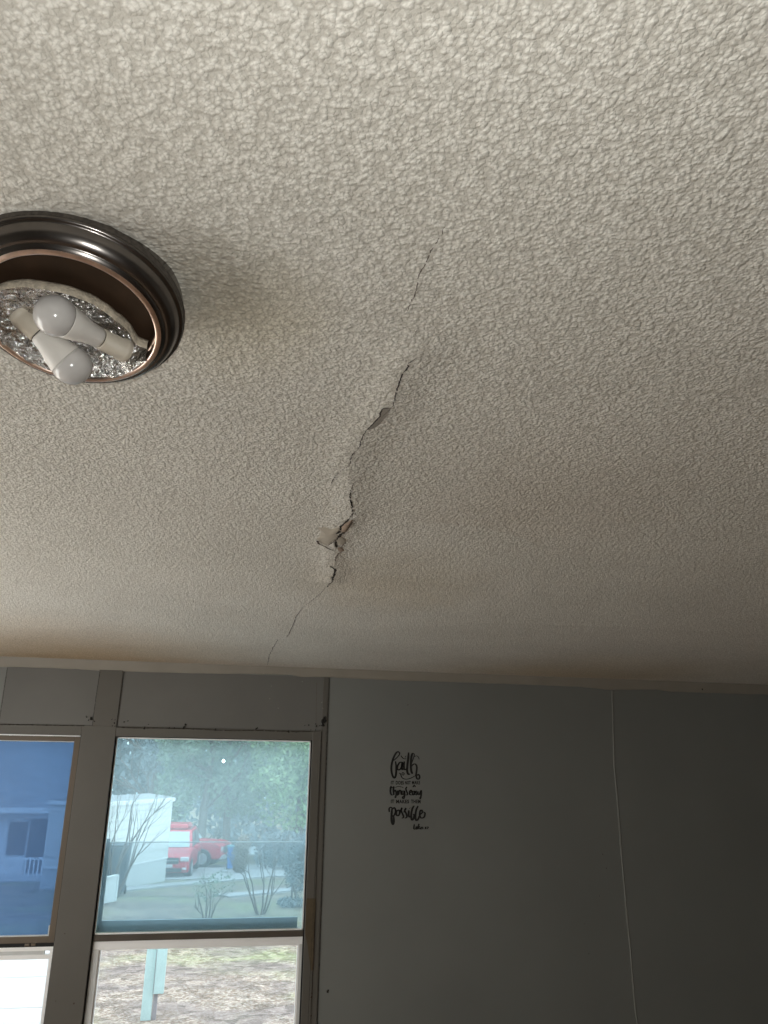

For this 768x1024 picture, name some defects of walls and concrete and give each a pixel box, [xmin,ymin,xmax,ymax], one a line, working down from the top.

crack [406,227,445,333]
crack [392,358,416,407]
spalling [366,407,392,431]
crack [267,431,366,664]
peeling [316,520,353,553]